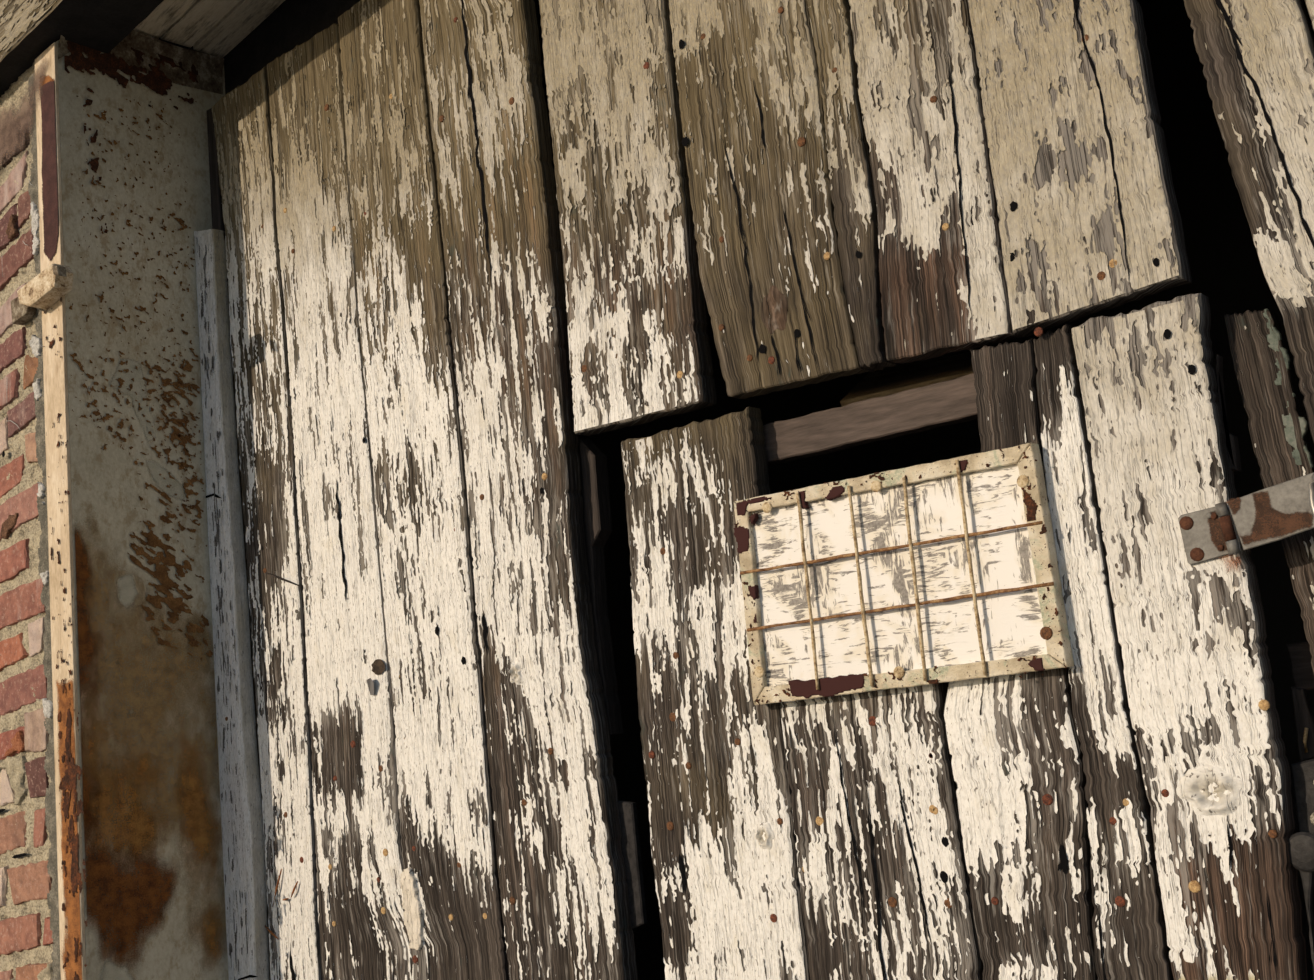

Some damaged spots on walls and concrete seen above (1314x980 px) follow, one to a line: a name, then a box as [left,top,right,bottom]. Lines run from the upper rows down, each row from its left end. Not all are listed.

crack [1073,0,1129,279]
peeling [1218,0,1314,476]
rust [39,41,226,980]
peeling [211,0,1179,980]
rust [733,490,809,554]
rust [824,472,921,501]
rust [986,446,1047,545]
rust [1208,492,1313,551]
rust [740,574,940,705]
peeling [622,297,1283,980]
rust [1007,587,1066,678]